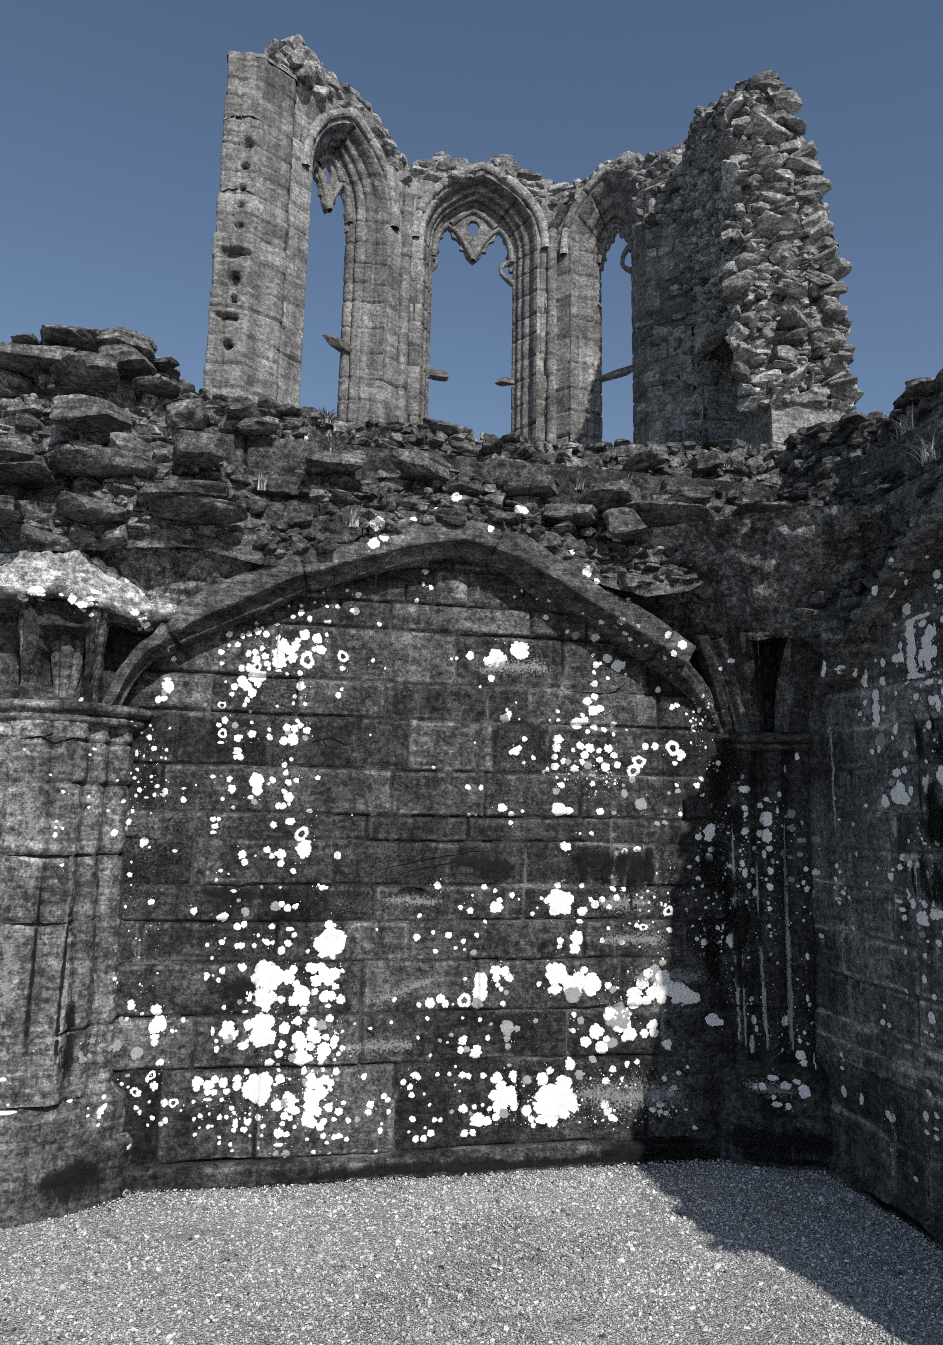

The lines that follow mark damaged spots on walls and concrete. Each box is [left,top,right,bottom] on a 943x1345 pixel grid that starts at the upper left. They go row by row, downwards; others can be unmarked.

water stain [911,714,943,910]